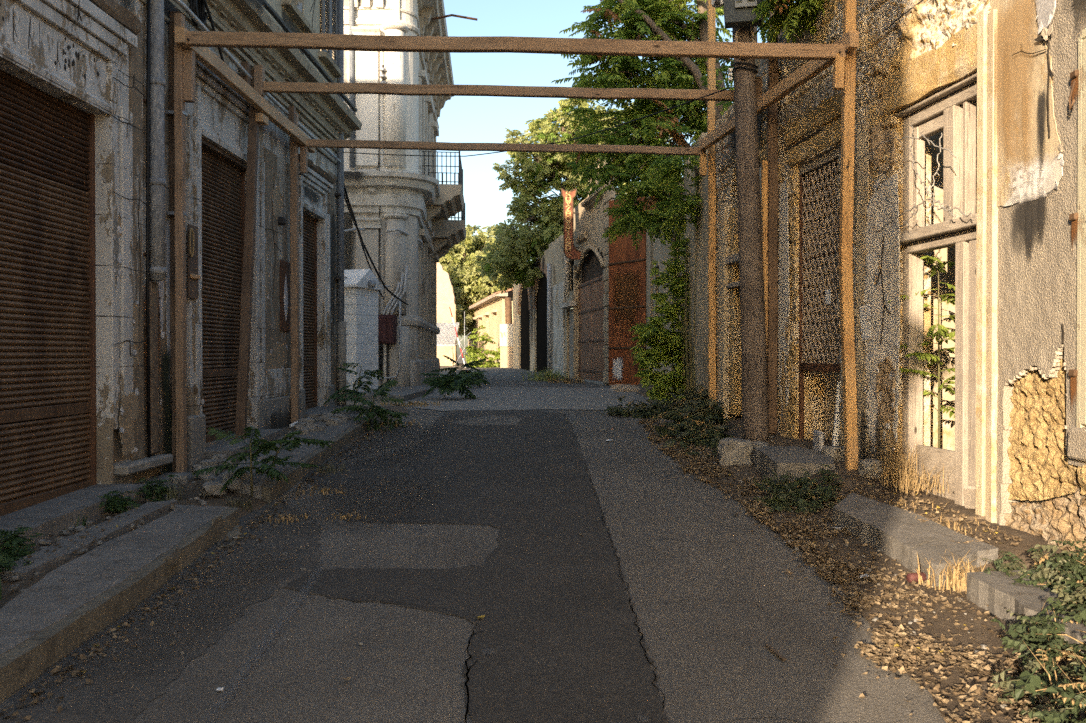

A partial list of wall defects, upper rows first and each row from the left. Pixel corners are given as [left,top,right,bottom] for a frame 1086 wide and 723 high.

peeling [54,37,99,84]
peeling [876,0,1064,207]
peeling [855,122,901,478]
spalling [1004,346,1086,563]
crack [465,627,483,723]